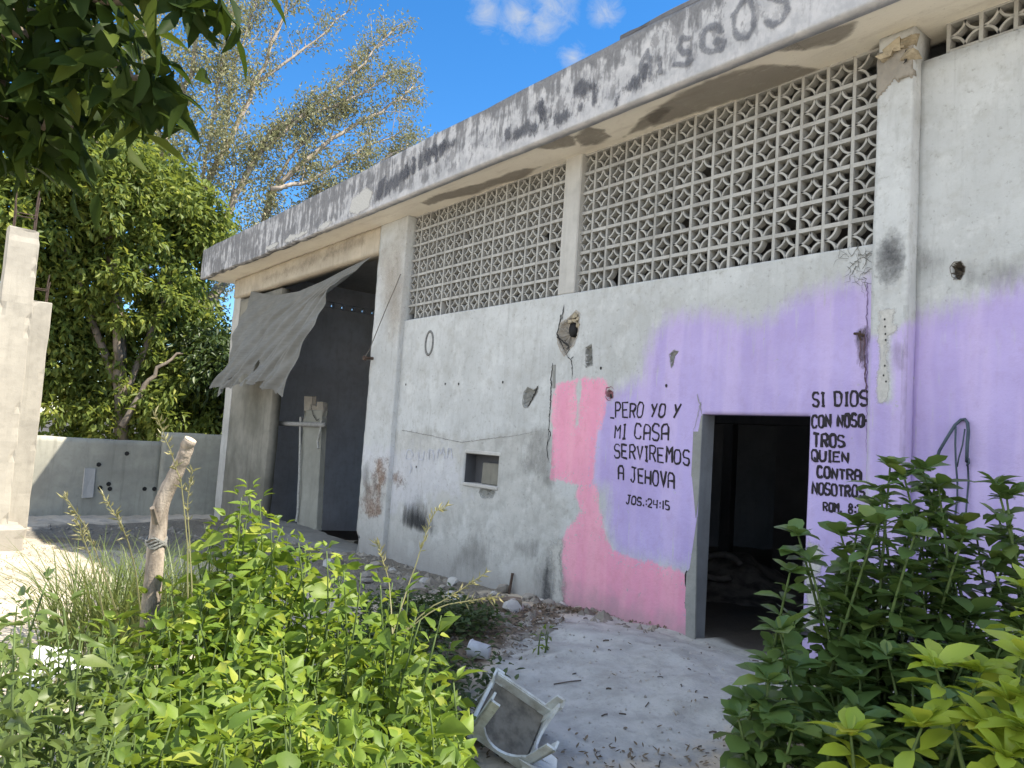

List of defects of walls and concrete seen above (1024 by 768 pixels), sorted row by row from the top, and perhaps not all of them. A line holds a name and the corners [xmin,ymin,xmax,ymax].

damp [504,78,607,149]
damp [615,64,648,106]
damp [632,66,815,133]
spalling [875,33,922,99]
damp [376,140,455,200]
damp [424,169,531,205]
spalling [950,261,966,280]
crack [402,307,574,460]
spalling [522,385,539,408]
spalling [557,310,593,368]
crack [836,241,872,442]
corrosion [853,328,868,398]